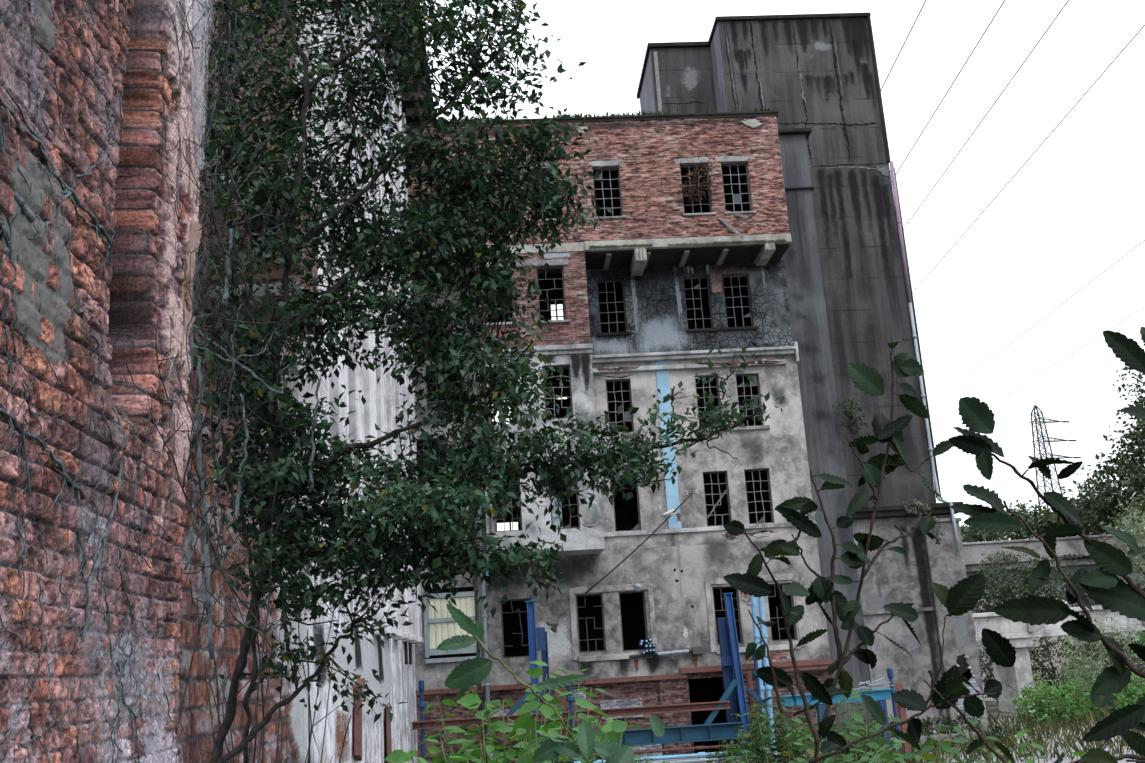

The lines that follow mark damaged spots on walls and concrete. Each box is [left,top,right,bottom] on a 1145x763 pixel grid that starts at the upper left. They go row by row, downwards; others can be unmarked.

water stain [730,20,831,93]
crack [724,22,887,169]
water stain [806,19,875,106]
water stain [818,169,893,274]